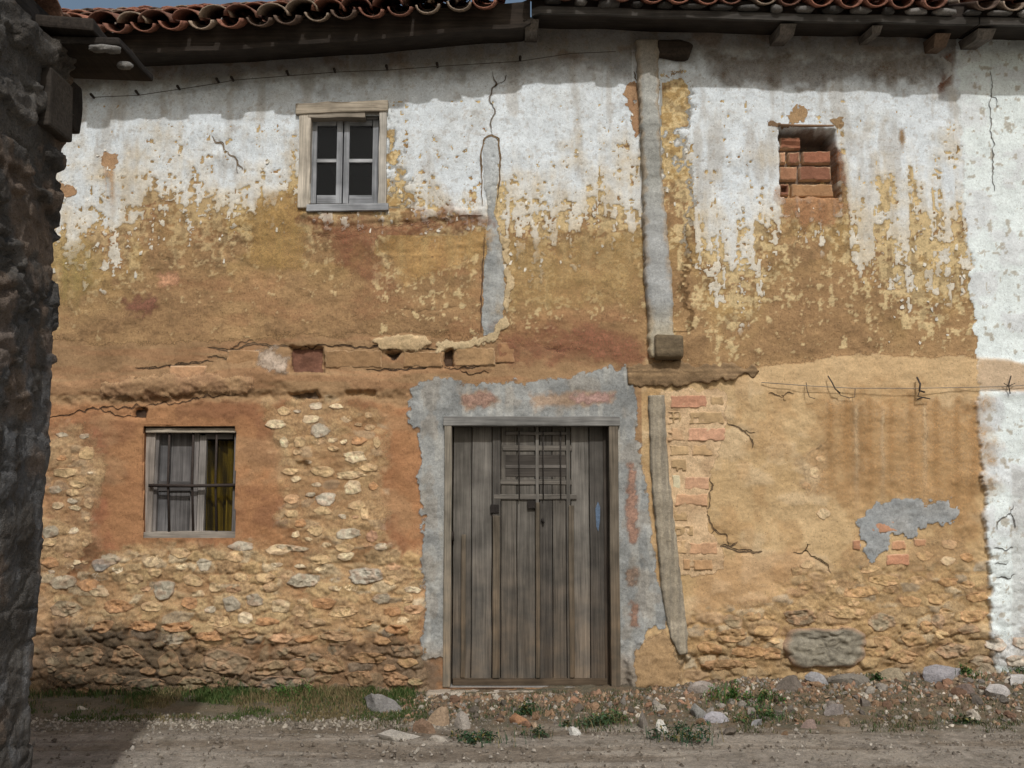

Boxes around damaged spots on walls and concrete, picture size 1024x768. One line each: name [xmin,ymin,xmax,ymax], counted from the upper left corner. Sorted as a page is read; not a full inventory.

crack [213,137,243,173]
crack [489,71,507,132]
crack [989,72,998,191]
peeling [51,70,978,374]
crack [52,394,236,417]
spalling [170,366,207,378]
crack [135,338,497,375]
spalling [659,387,727,577]
crack [707,479,762,554]
crack [793,544,829,569]
crack [995,507,1016,579]
spalling [688,531,1024,675]